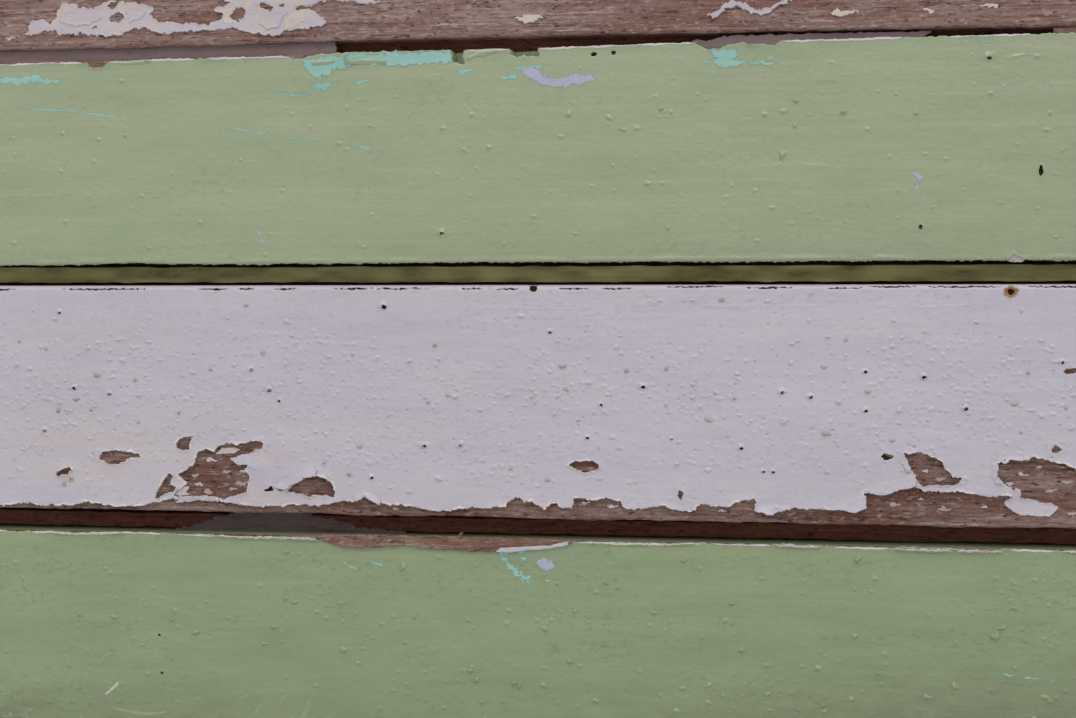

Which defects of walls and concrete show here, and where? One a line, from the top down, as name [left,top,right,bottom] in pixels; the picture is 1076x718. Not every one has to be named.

peeling [6,0,381,41]
peeling [514,14,543,24]
peeling [707,0,792,19]
peeling [831,8,859,17]
peeling [0,434,1076,528]
spalling [217,533,573,587]